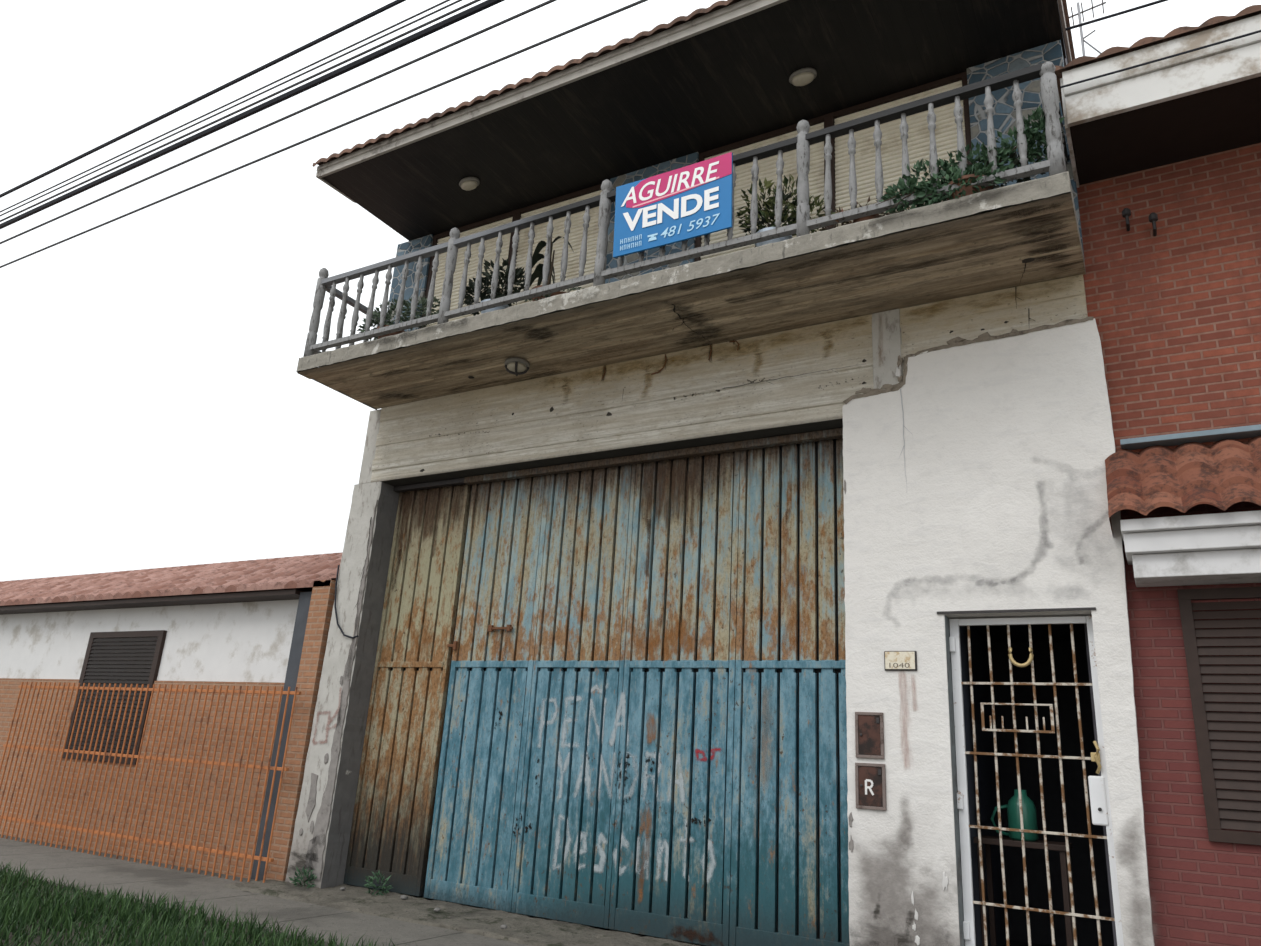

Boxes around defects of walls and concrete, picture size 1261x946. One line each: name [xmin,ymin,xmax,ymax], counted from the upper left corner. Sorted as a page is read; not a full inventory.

water stain [680,231,963,290]
water stain [727,206,1076,303]
flaking render [843,317,1094,404]
corrosion [641,455,710,576]
water stain [862,818,950,946]